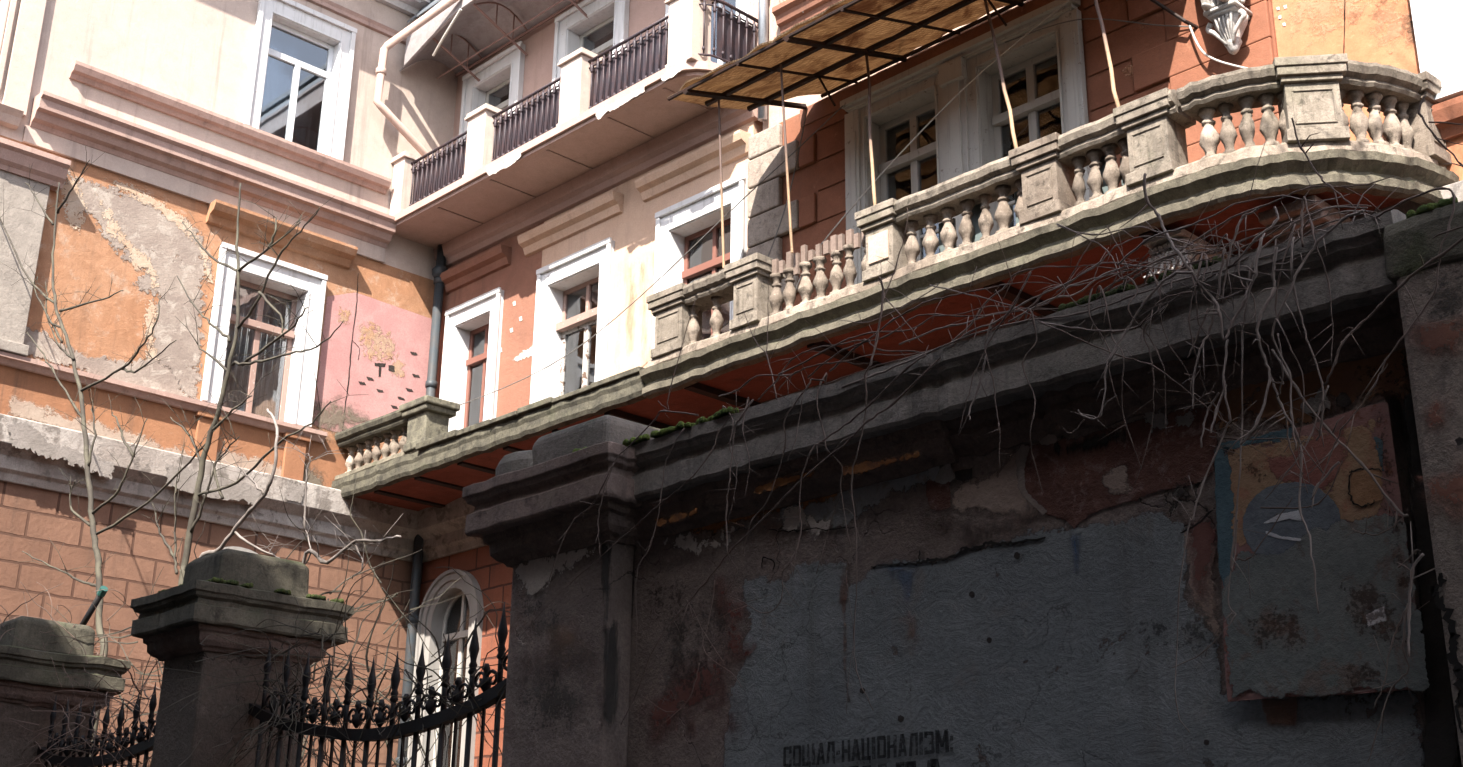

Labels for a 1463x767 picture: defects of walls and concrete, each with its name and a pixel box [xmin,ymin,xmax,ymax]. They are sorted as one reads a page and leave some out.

peeling [24,171,213,400]
peeling [7,422,115,479]
spalling [951,348,1410,529]
peeling [165,464,262,505]
peeling [283,481,305,503]
peeling [515,546,596,595]
damp [518,542,744,741]